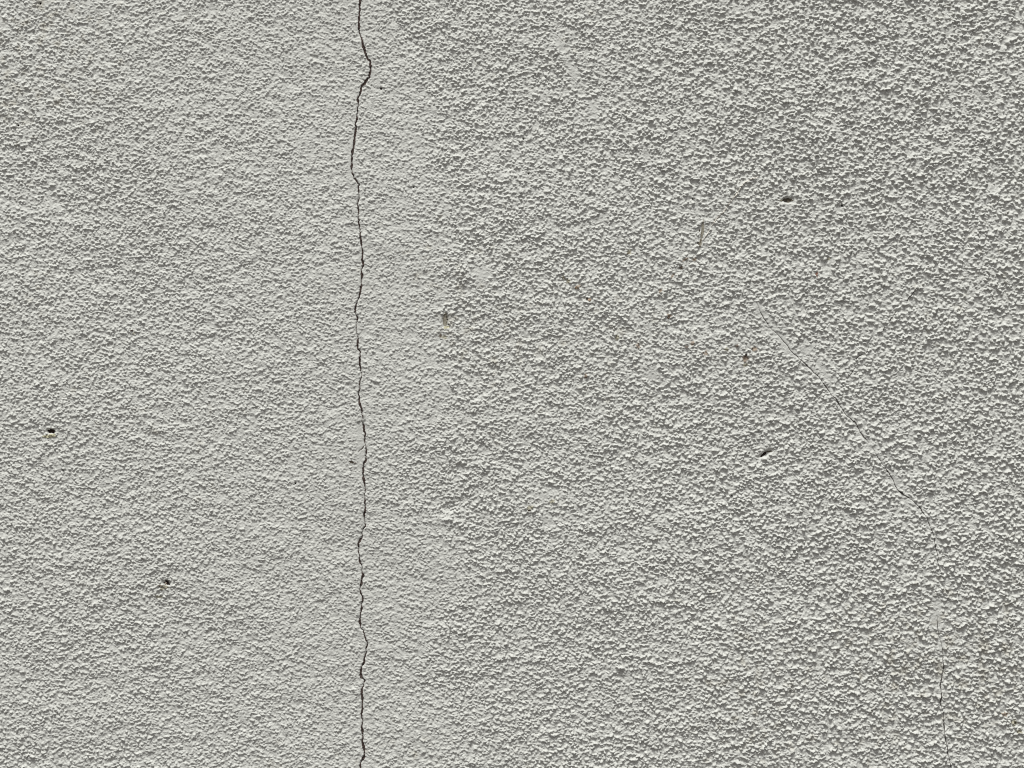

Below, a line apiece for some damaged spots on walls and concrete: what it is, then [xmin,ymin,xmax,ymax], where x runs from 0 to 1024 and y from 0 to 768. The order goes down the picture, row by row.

crack [350,0,372,768]